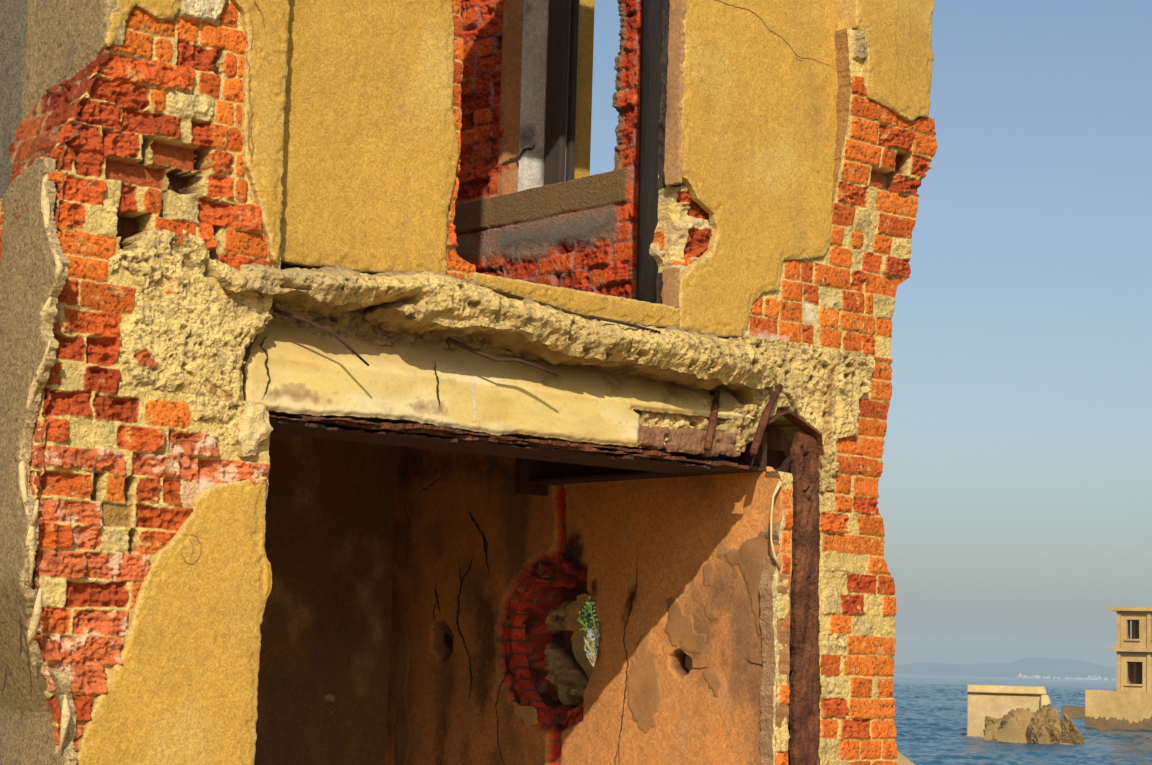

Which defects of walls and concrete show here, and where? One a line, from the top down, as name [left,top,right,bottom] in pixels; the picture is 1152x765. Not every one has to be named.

flaking render [452,0,464,155]
crack [716,0,835,69]
flaking render [0,192,28,262]
flaking render [7,0,281,754]
crack [259,336,271,400]
crack [433,360,441,405]
flaking render [204,27,938,765]
crack [433,504,524,765]
crack [614,544,638,764]